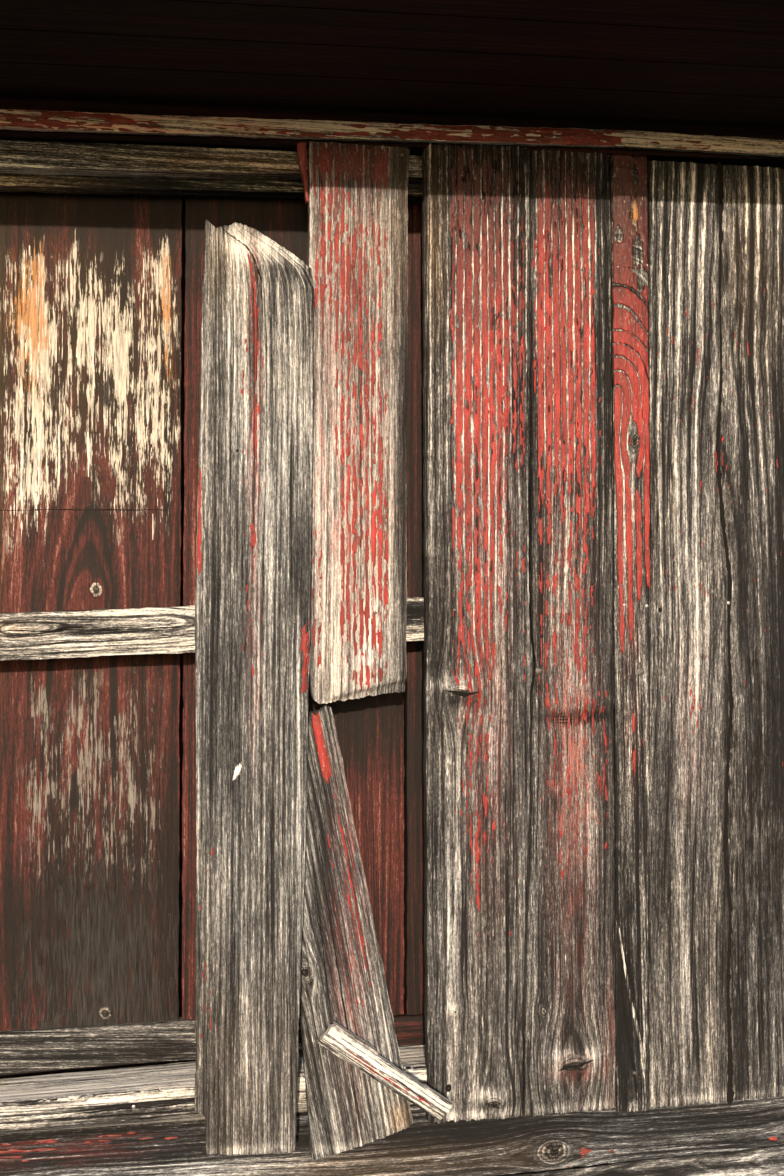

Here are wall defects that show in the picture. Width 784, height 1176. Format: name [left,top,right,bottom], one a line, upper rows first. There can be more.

peeling [0,110,166,133]
peeling [0,229,181,547]
peeling [206,124,660,911]
peeling [17,670,162,879]
crack [533,683,541,872]
peeling [327,815,370,1007]